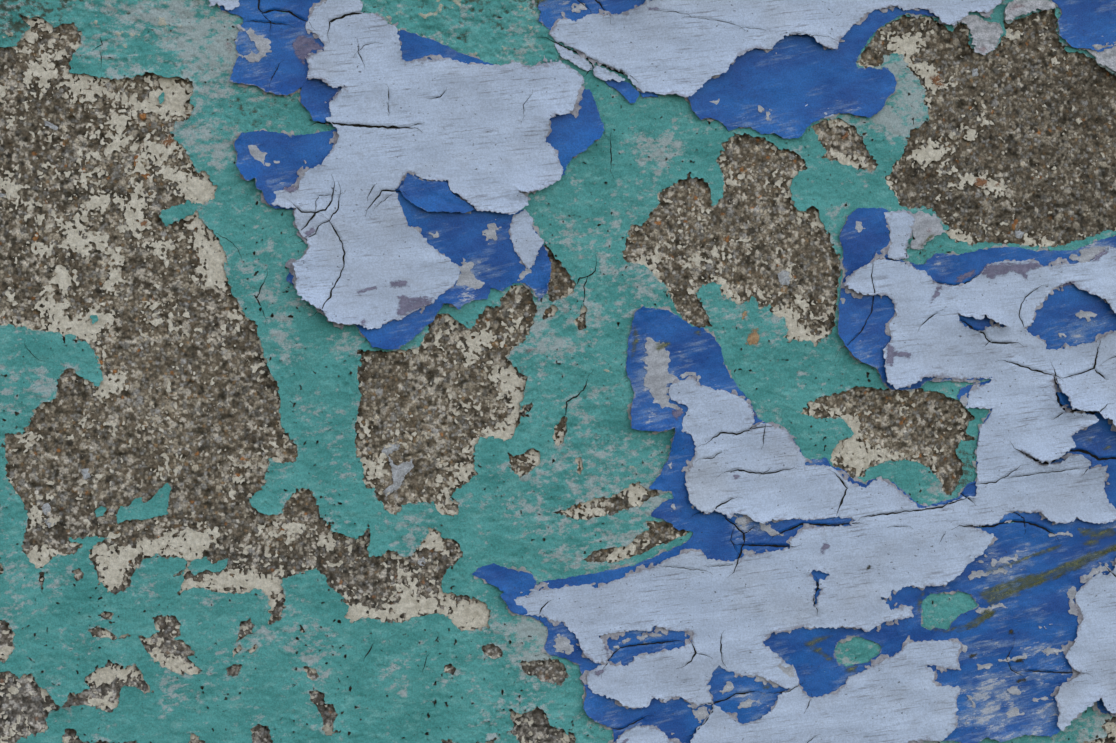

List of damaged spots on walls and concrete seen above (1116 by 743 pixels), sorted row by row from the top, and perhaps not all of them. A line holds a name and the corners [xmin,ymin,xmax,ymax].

crack [308,87,447,132]
crack [537,37,637,81]
crack [289,179,409,315]
peeling [209,0,604,516]
spalling [0,15,492,631]
peeling [472,0,1116,743]
crack [918,284,1116,420]
spalling [0,620,154,743]
spalling [88,605,202,679]
spalling [303,666,342,736]
crack [601,631,727,676]
crack [686,684,820,743]